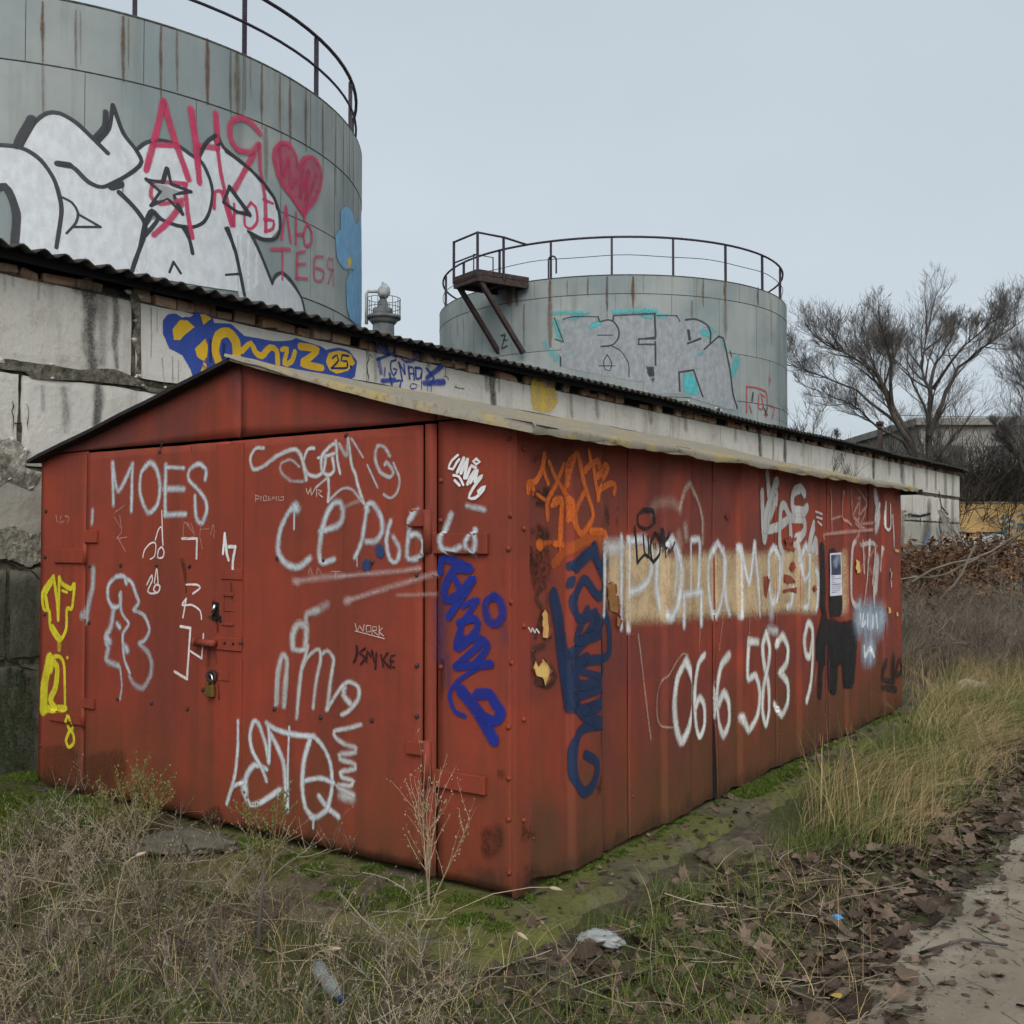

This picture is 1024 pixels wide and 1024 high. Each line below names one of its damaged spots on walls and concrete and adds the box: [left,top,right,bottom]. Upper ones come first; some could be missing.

damp [75,285,120,369]
damp [94,383,102,425]
spalling [0,437,42,490]
spalling [0,524,41,567]
rust [530,525,549,586]